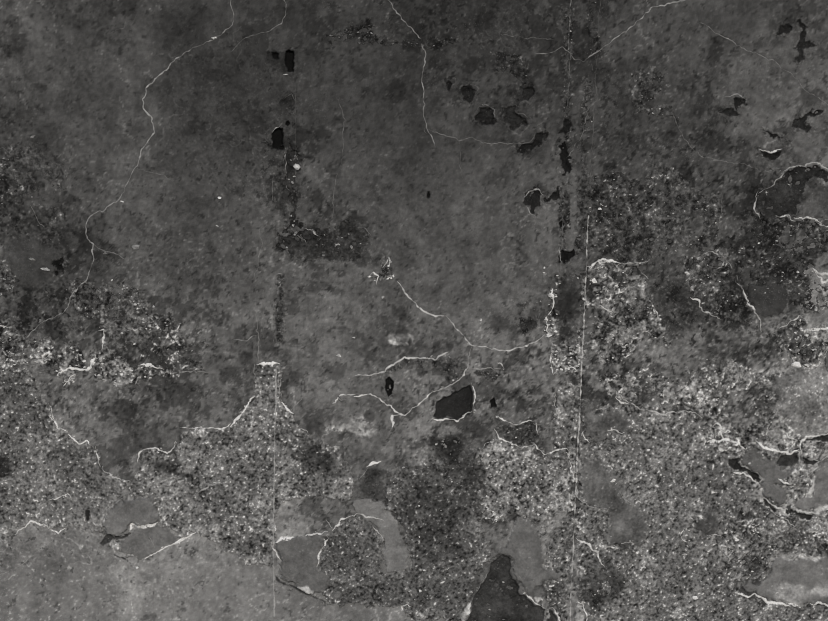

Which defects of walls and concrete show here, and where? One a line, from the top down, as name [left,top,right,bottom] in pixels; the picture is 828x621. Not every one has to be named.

crack [388,0,513,178]
crack [504,0,685,156]
crack [698,21,828,105]
crack [27,0,287,337]
spalling [29,252,70,278]
crack [234,300,260,361]
crack [397,281,544,372]
spalling [271,0,828,621]
spalling [0,277,356,568]
crack [334,392,432,427]